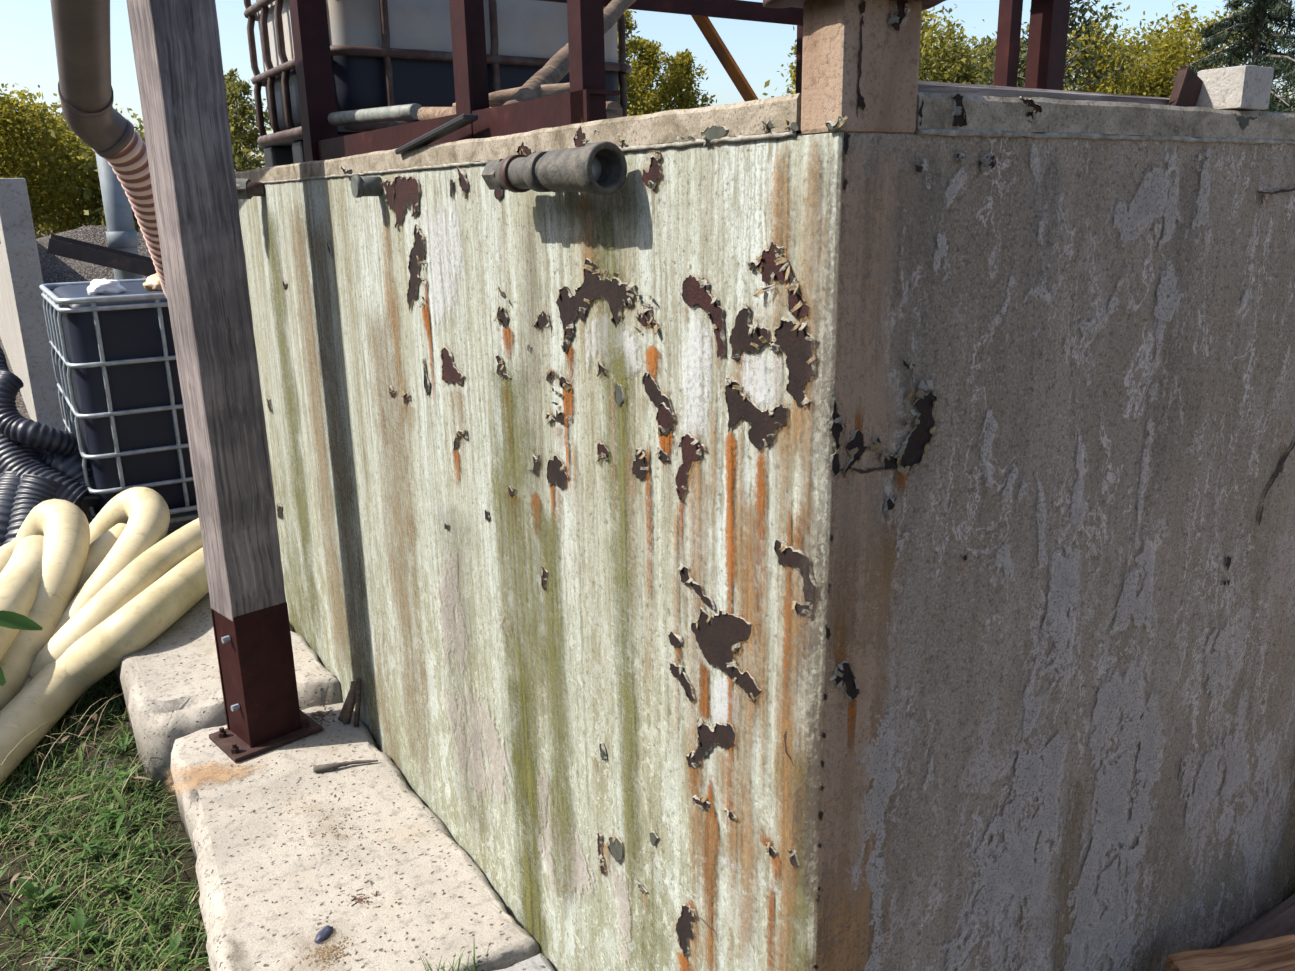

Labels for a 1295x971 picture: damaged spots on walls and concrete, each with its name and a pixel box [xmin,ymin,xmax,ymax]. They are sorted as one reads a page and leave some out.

water stain [292,217,399,766]
water stain [369,322,427,759]
peeling [381,174,429,333]
peeling [494,287,530,438]
peeling [507,454,568,537]
water stain [612,353,640,881]
peeling [533,223,832,971]
rust [674,142,917,971]
peeling [824,615,860,749]
peeling [828,360,937,572]